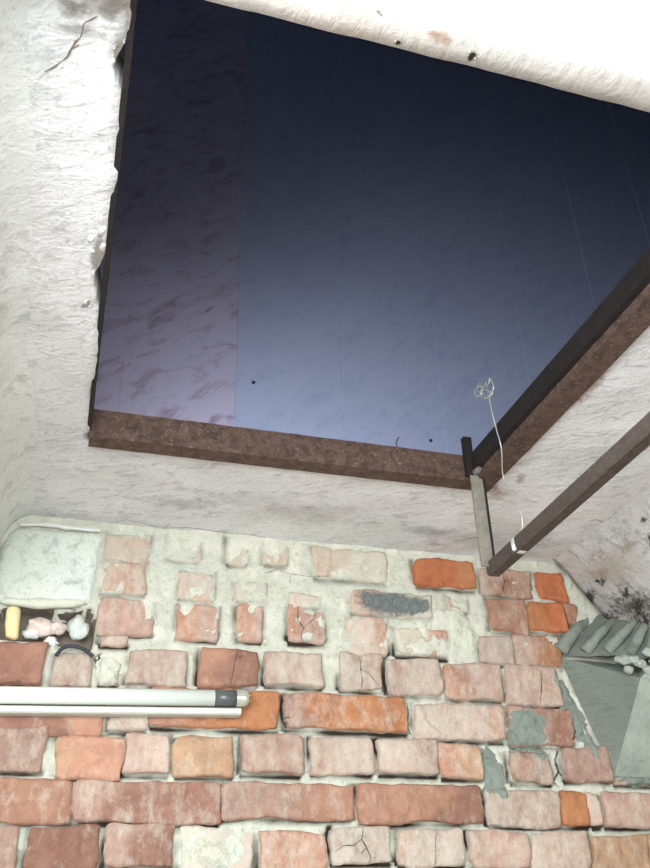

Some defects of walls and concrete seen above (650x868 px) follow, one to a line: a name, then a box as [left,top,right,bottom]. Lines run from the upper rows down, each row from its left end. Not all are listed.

crack [45,16,97,72]
peeling [0,522,104,651]
water stain [602,587,650,625]
crack [335,830,371,861]